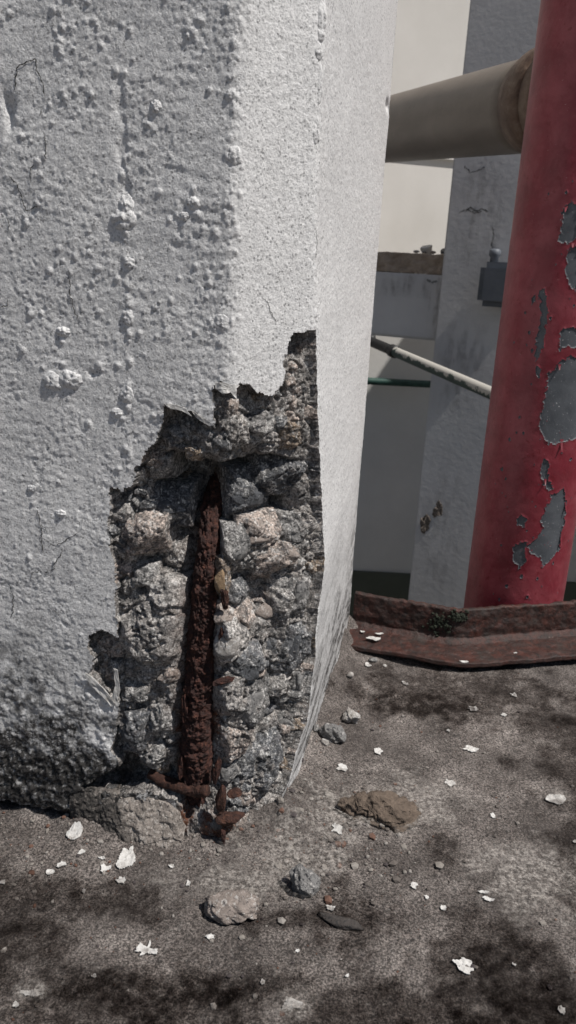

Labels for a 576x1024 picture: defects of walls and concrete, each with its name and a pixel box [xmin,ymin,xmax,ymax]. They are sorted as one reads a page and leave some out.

peeling [555,180,576,308]
peeling [513,288,576,461]
peeling [500,458,572,587]
spalling [81,330,325,846]
rust [181,796,235,838]